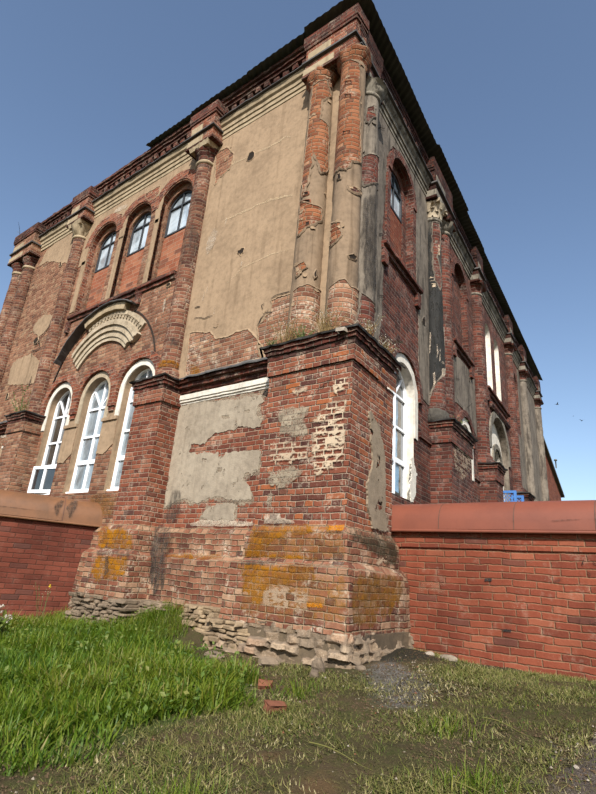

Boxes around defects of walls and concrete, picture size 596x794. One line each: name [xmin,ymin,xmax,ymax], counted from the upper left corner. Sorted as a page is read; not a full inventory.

spalling [297,59,379,248]
peeling [5,314,53,400]
spalling [184,260,376,379]
water stain [388,232,446,405]
peeling [163,390,303,523]
peeling [279,406,309,438]
peeling [366,411,389,531]
water stain [263,588,307,611]
water stain [352,530,397,565]